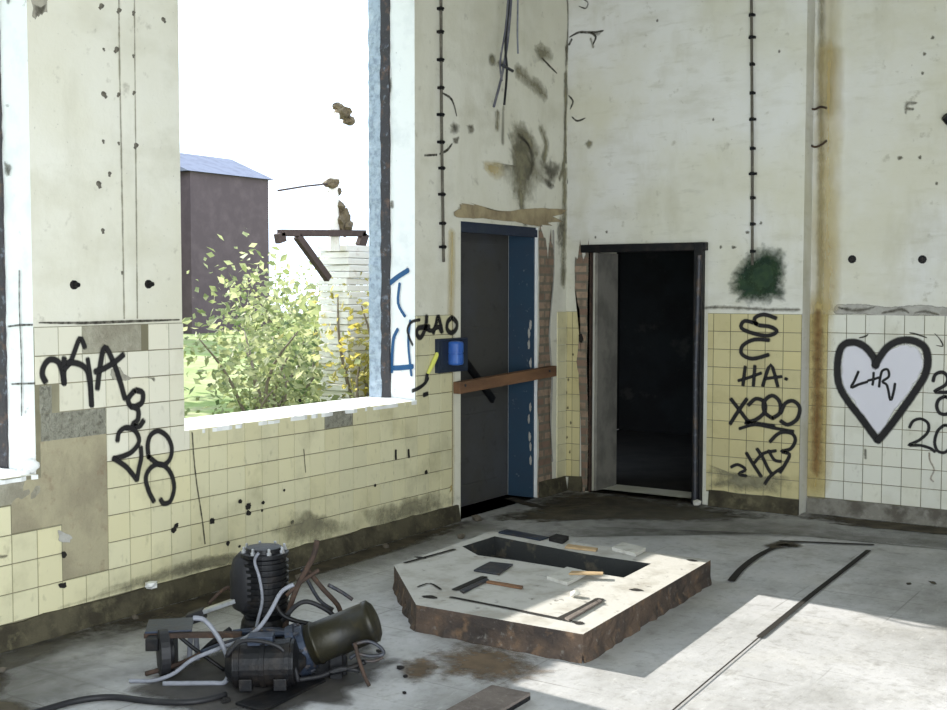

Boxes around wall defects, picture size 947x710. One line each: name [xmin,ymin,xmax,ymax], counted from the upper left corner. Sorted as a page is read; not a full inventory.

damp [516,67,547,98]
damp [506,127,558,209]
peeling [0,270,108,588]